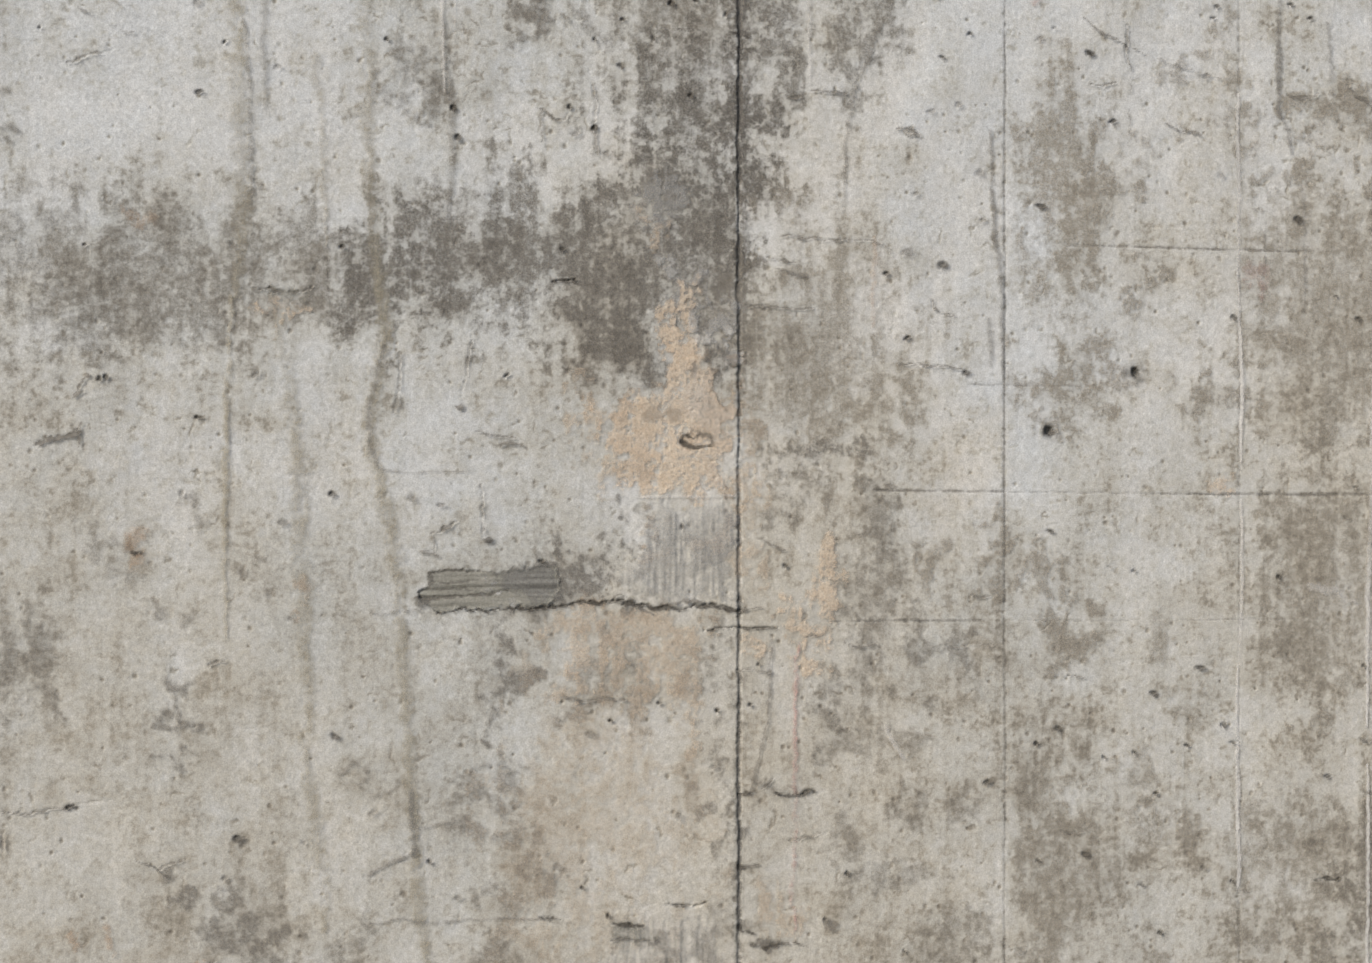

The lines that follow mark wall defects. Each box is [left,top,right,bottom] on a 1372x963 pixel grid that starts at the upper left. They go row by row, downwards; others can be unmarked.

water stain [346,0,848,428]
peeling [588,257,743,506]
spalling [415,560,559,613]
crack [438,594,777,631]